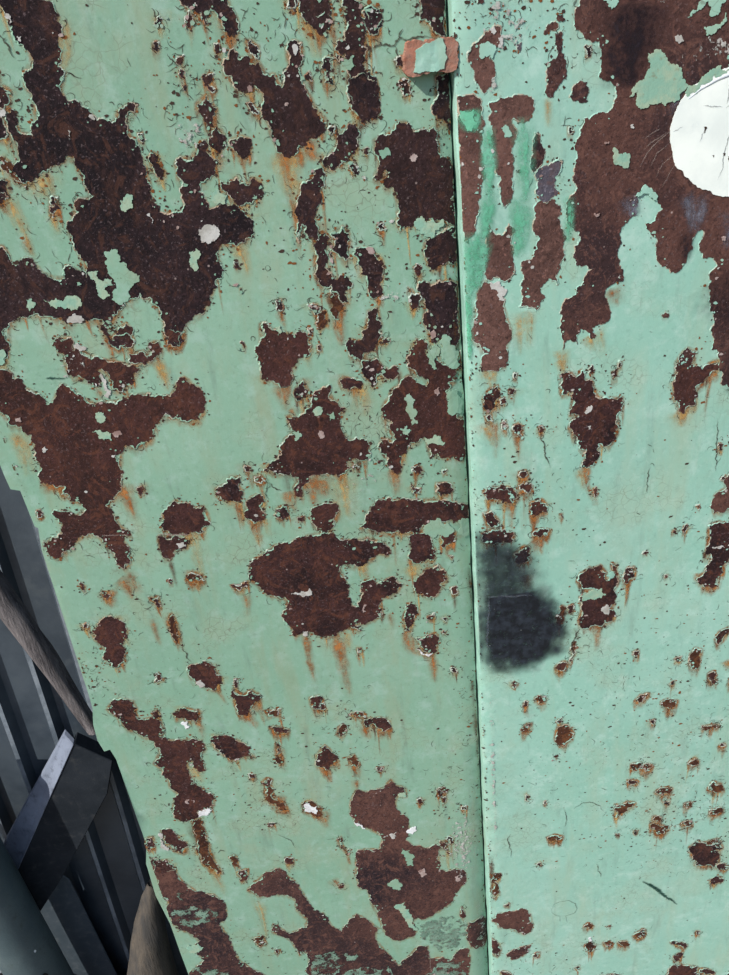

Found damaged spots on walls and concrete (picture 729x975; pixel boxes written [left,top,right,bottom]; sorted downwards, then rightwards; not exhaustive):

peeling [543,14,565,35]
peeling [246,39,261,60]
peeling [175,54,187,91]
peeling [202,72,217,100]
rust [179,0,729,677]
rust [92,615,128,670]
rust [186,660,262,723]
rust [108,697,264,975]
peeling [228,854,249,882]
rust [247,779,533,975]
rust [688,840,723,869]
peeling [478,935,502,957]